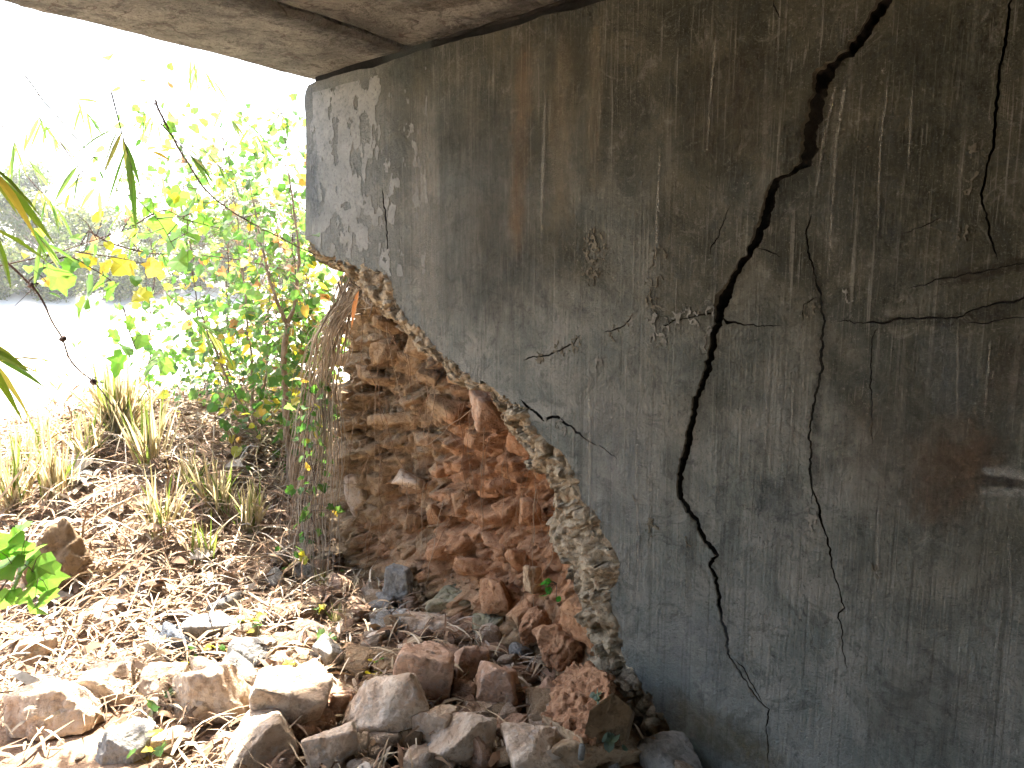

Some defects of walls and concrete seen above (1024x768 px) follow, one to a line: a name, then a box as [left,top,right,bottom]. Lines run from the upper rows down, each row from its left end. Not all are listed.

spalling [308,75,670,736]
crack [521,400,618,460]
crack [525,317,631,360]
crack [660,0,1024,764]